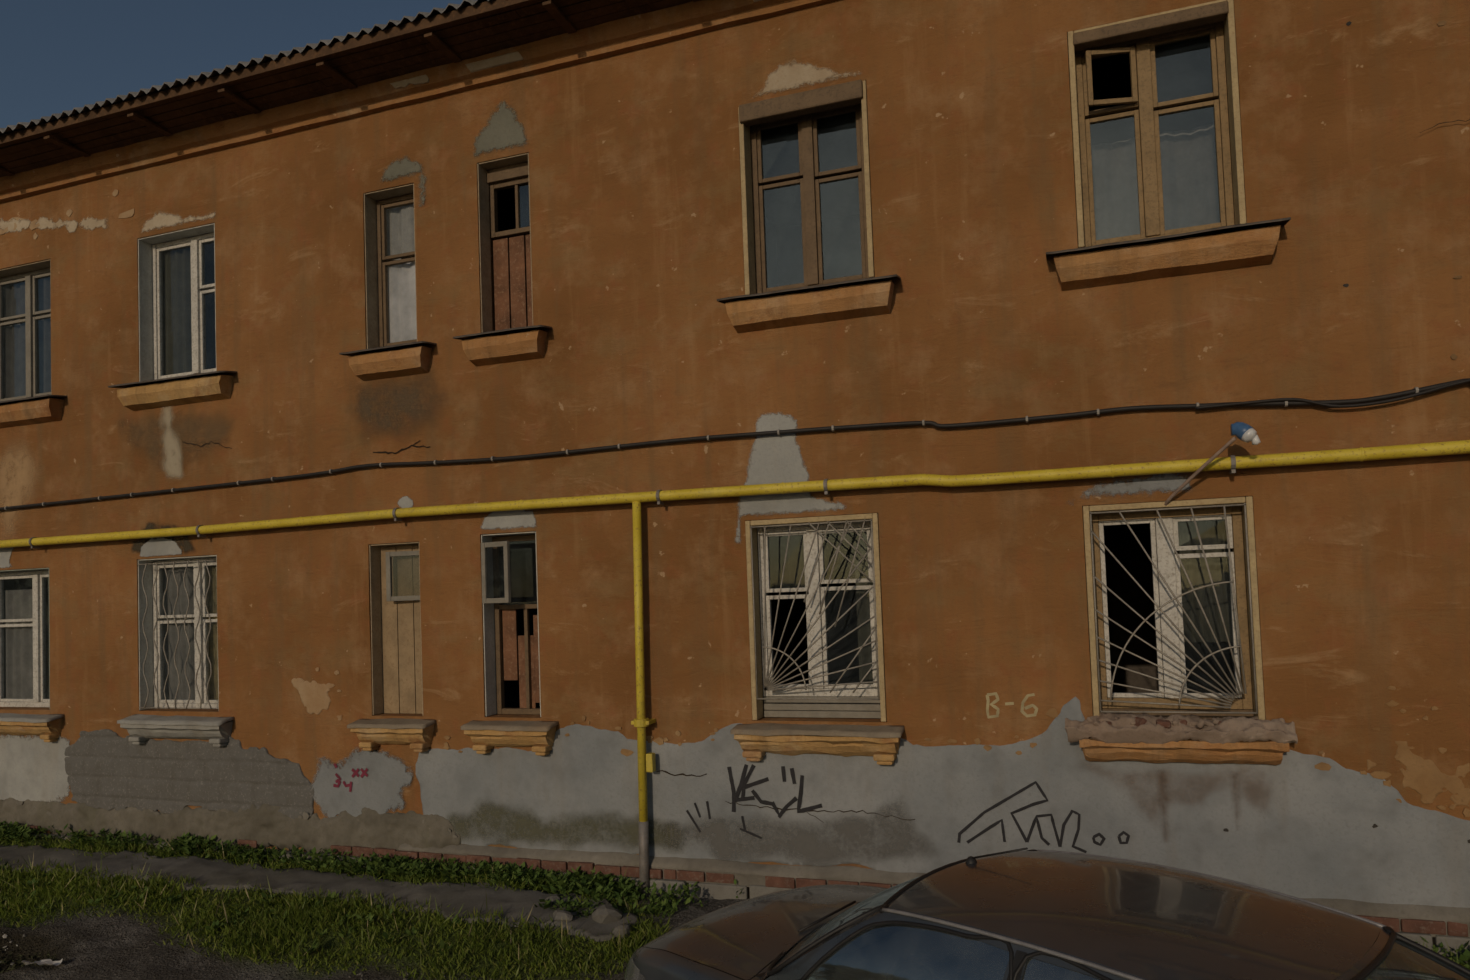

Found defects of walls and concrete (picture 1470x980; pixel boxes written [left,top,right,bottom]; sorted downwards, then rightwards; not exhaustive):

peeling [758,61,860,95]
peeling [0,189,135,239]
peeling [291,667,342,720]
flaking render [0,729,461,857]
peeling [1360,733,1470,807]